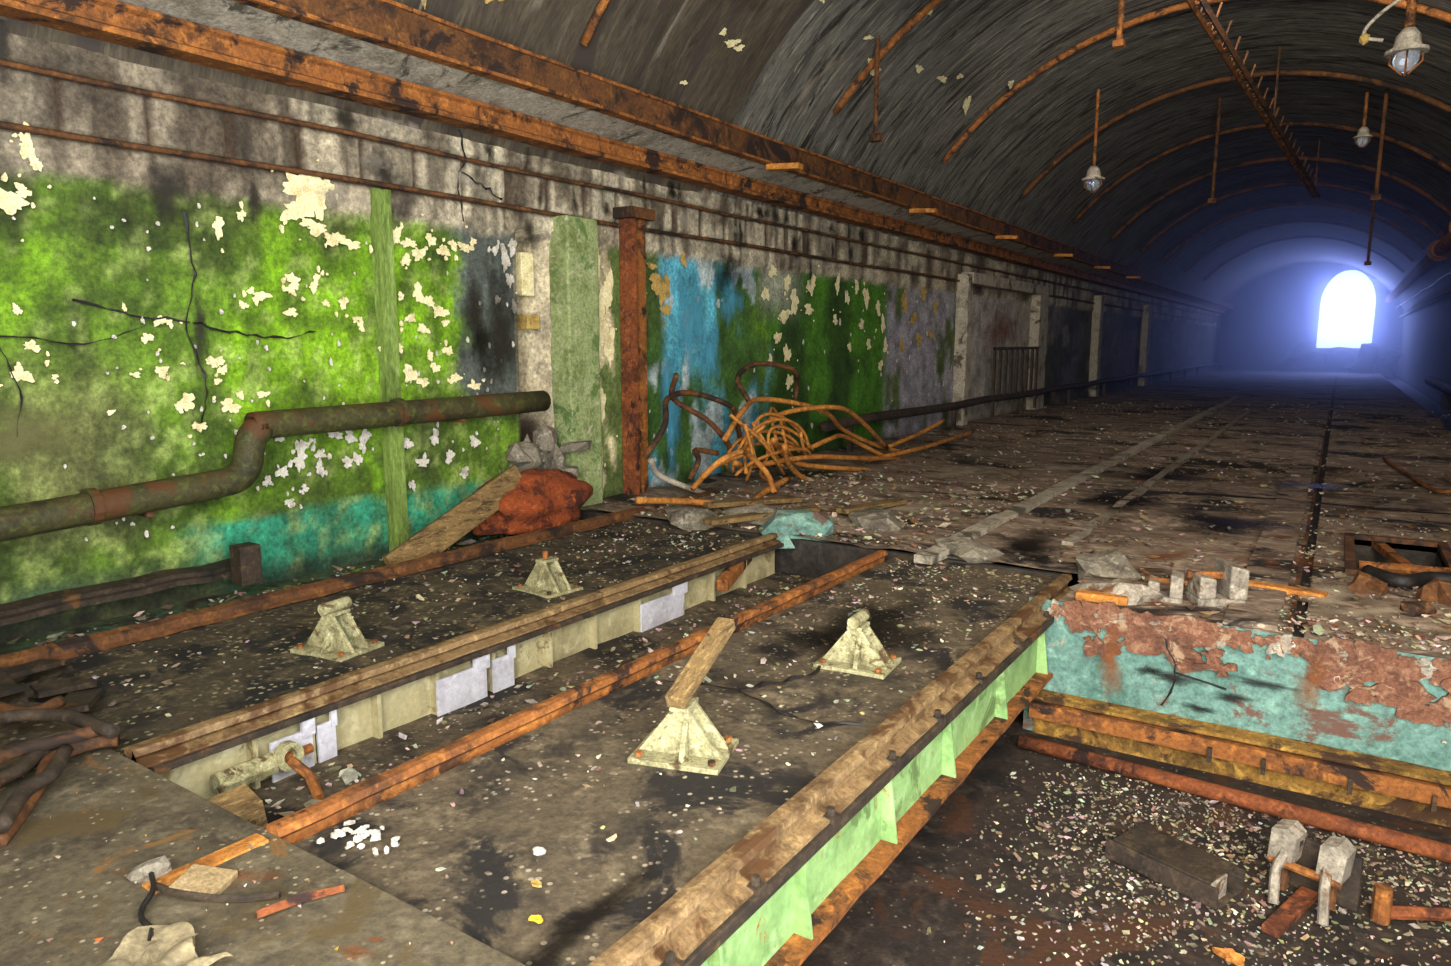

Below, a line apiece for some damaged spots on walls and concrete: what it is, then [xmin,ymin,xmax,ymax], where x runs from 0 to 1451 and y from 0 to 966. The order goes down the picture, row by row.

peeling [0,121,51,220]
crack [0,211,316,437]
peeling [106,302,270,456]
water stain [250,184,259,214]
peeling [271,159,373,253]
peeling [393,214,519,395]
water stain [466,285,515,378]
water stain [526,222,535,248]
water stain [663,365,677,462]
water stain [719,207,812,315]
peeling [256,429,374,509]
spalling [1023,597,1451,771]